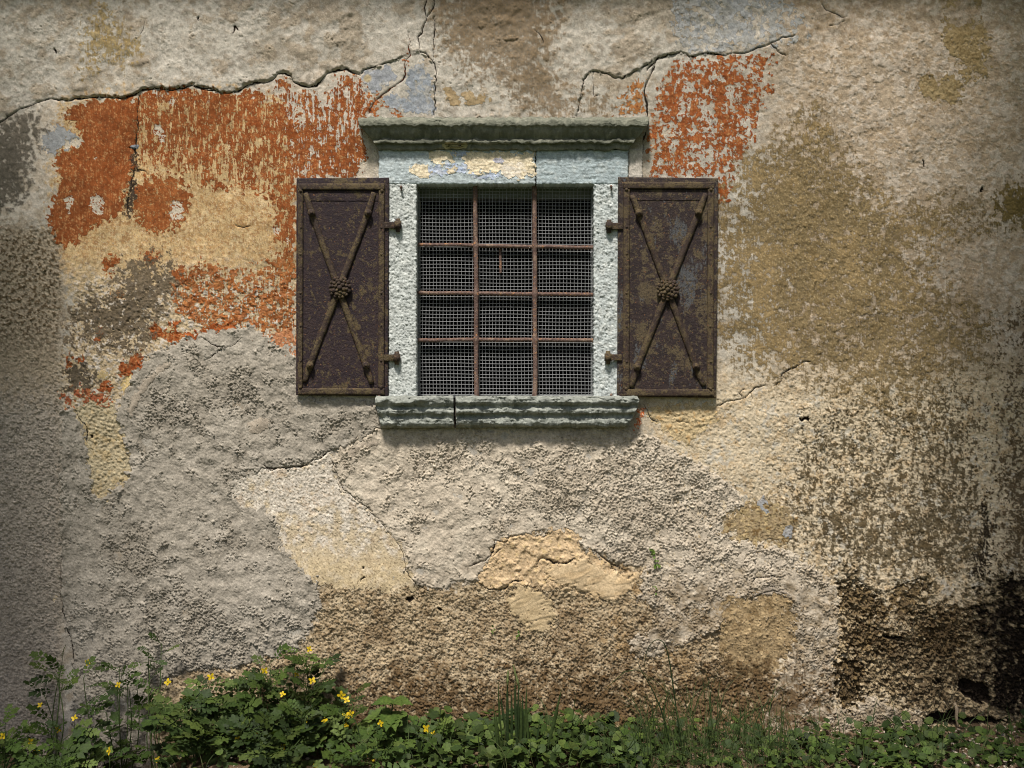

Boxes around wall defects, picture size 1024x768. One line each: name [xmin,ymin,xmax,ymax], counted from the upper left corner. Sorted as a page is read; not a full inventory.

crack [0,0,437,210]
peeling [41,53,492,356]
peeling [409,150,537,182]
crack [577,37,787,154]
peeling [612,0,811,203]
crack [717,361,811,406]
damp [717,98,1024,722]
crack [264,449,428,591]
spalling [475,526,642,603]